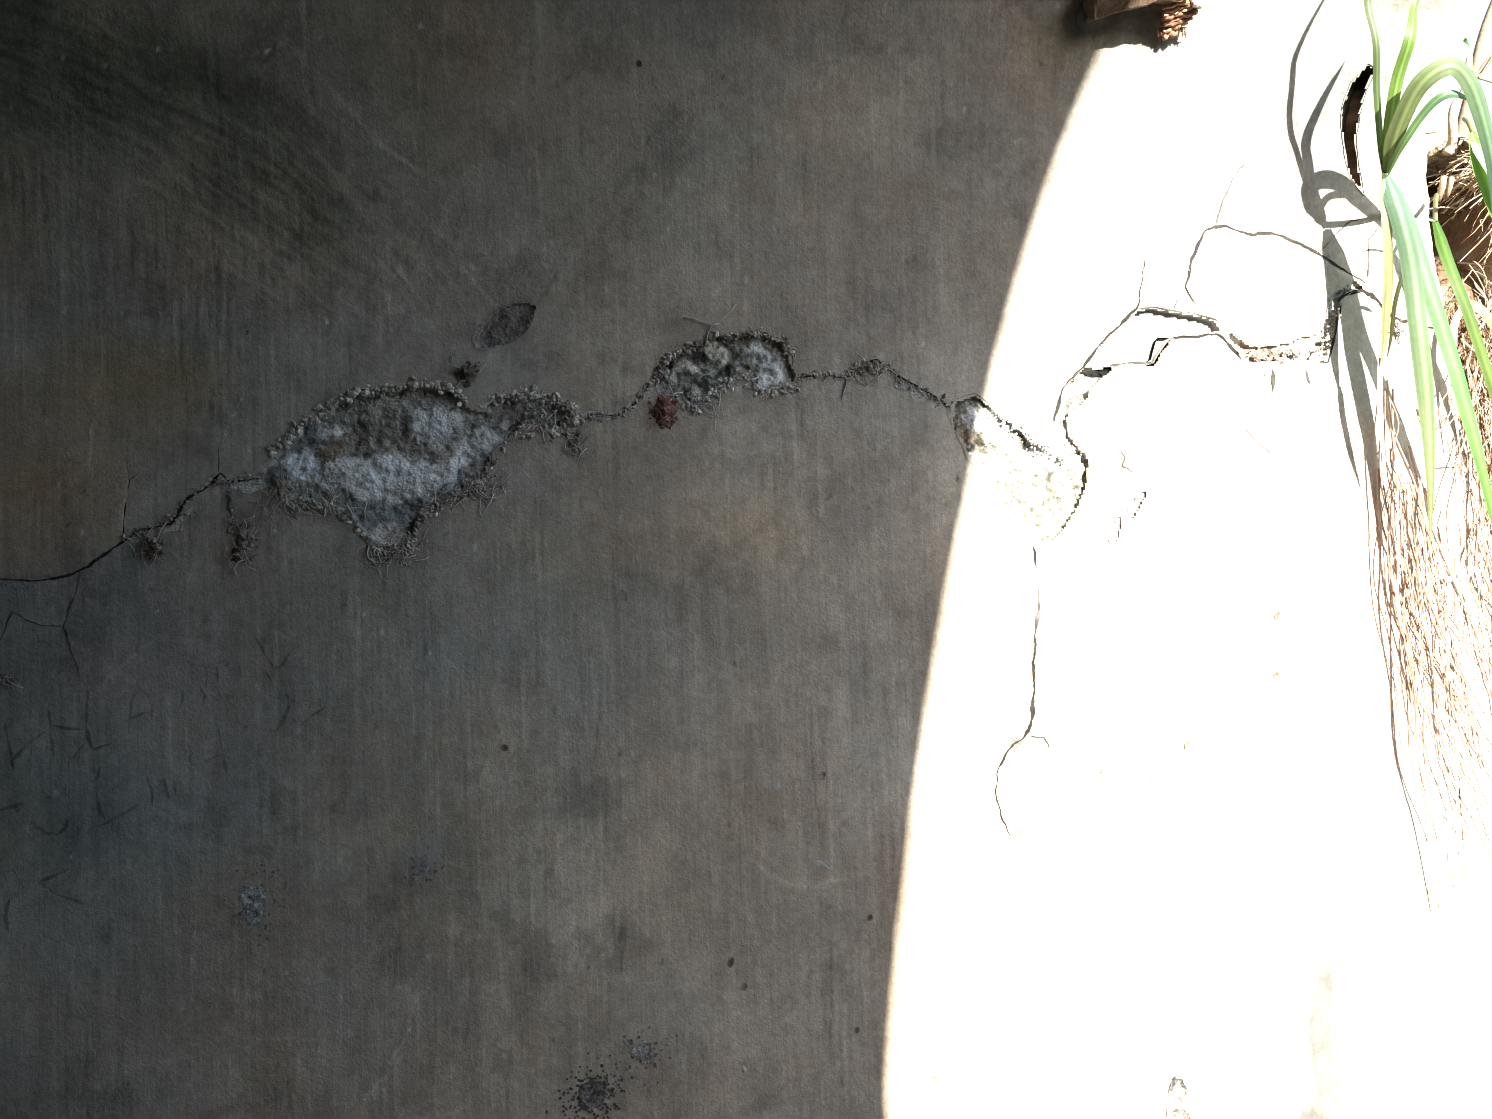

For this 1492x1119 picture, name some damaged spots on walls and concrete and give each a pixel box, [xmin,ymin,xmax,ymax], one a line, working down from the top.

crack [0,393,266,680]
flaking render [250,375,585,557]
flaking render [471,301,536,351]
crack [560,375,660,451]
flaking render [654,326,801,415]
crack [800,355,954,408]
crack [1119,429,1165,472]
flaking render [950,278,1376,548]
crack [1053,64,1433,455]
crack [995,546,1053,837]
flaking render [1166,1074,1191,1119]
water stain [1299,944,1348,1119]